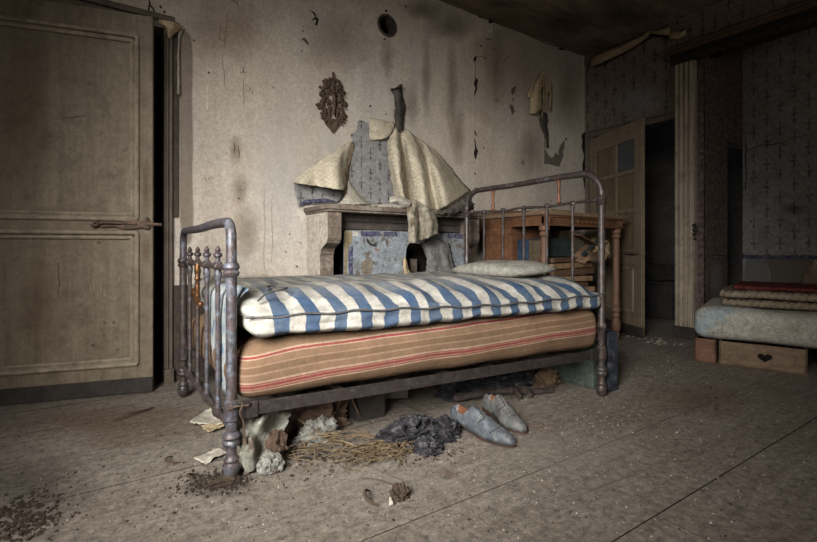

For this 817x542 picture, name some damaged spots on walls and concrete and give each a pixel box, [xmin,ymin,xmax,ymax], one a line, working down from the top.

peeling [590,24,687,67]
flaking render [544,141,565,167]